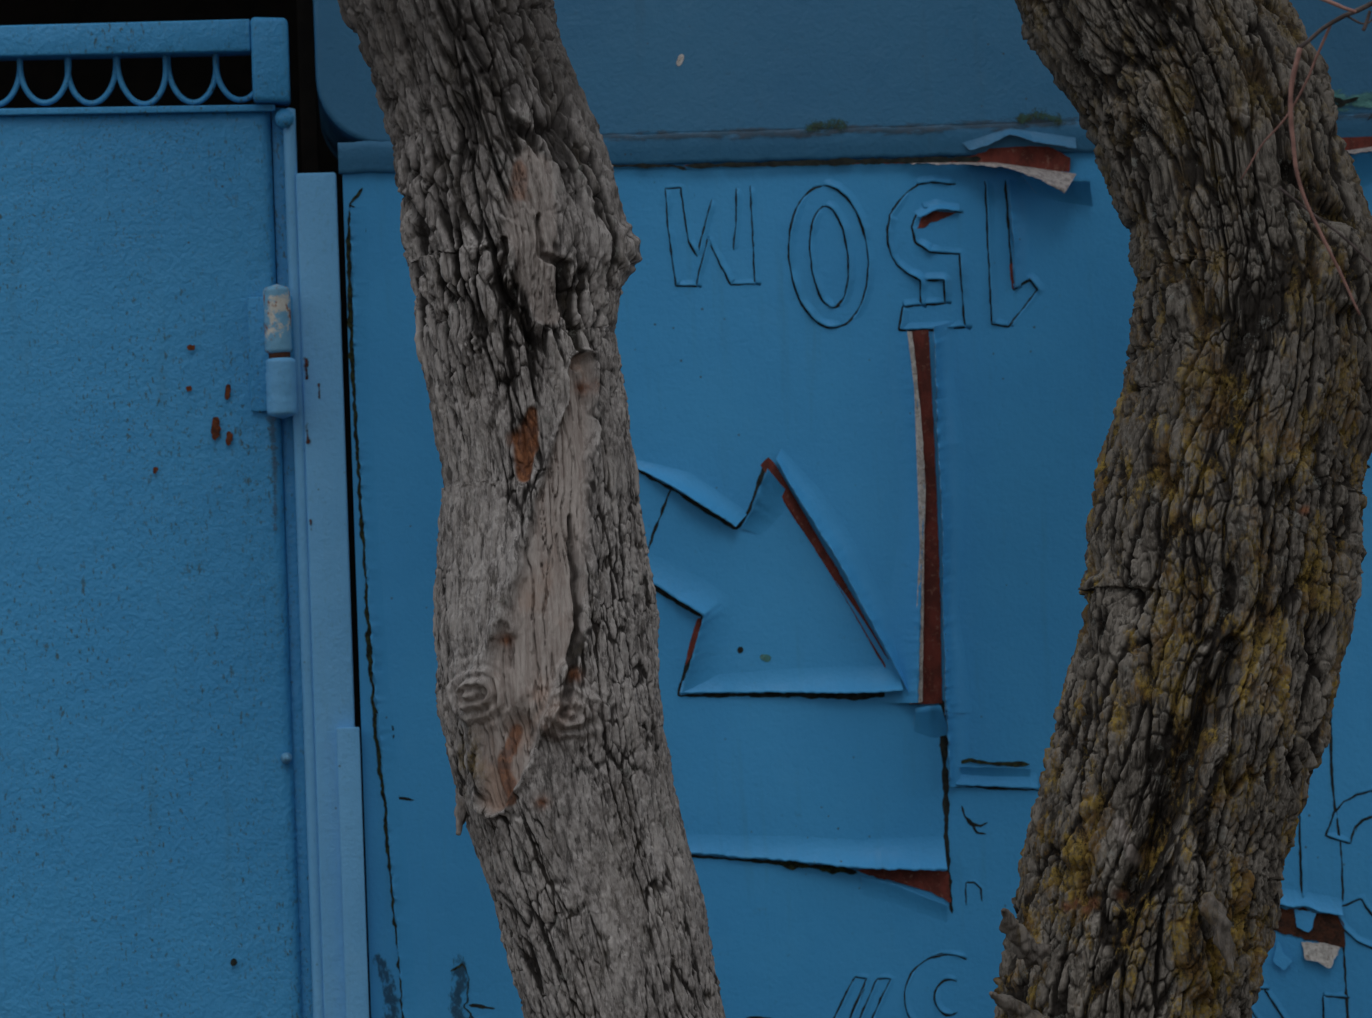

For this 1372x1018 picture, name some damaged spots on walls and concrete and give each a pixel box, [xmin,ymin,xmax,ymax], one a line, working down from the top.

rust [211,417,233,446]
peeling [1273,889,1345,970]